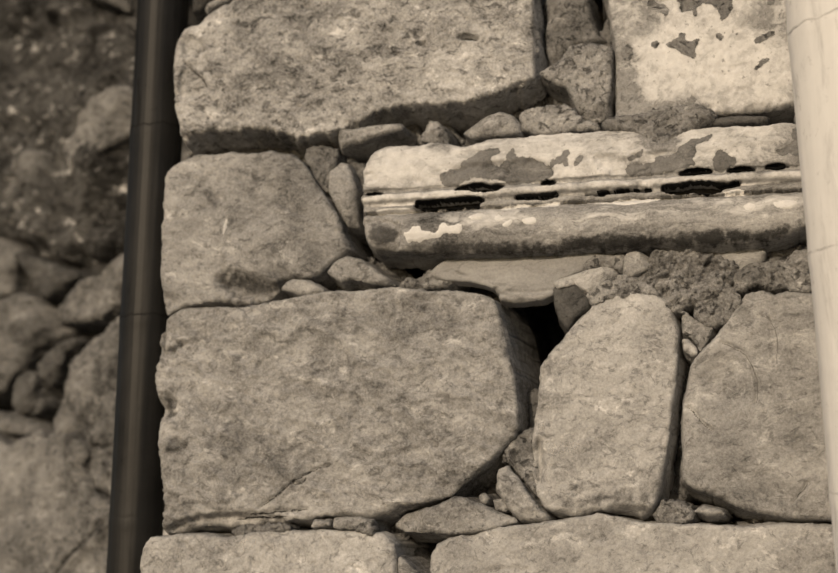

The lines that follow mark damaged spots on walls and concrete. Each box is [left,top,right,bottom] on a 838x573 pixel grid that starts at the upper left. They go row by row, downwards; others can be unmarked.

peeling [647,0,669,16]
peeling [677,0,733,21]
peeling [620,44,633,61]
peeling [651,33,700,59]
peeling [754,31,775,44]
peeling [766,128,799,170]
peeling [587,134,755,211]
peeling [404,148,583,243]
peeling [774,200,797,209]
crack [237,464,331,520]